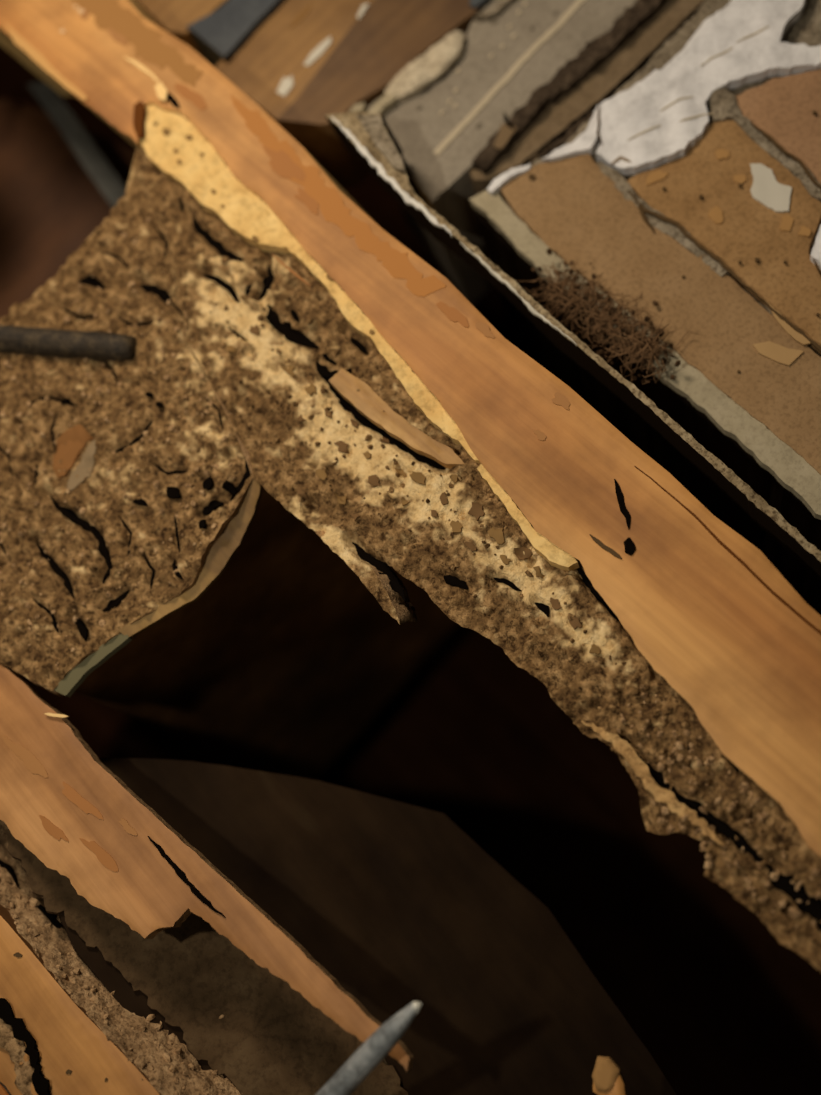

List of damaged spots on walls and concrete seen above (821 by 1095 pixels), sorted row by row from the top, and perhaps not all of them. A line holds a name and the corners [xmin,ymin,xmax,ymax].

crack [597,104,631,166]
crack [750,122,821,189]
crack [140,284,172,303]
crack [627,190,821,353]
spalling [752,301,811,366]
crack [589,466,821,634]
crack [577,566,621,623]
crack [147,836,226,918]
crack [0,998,50,1095]